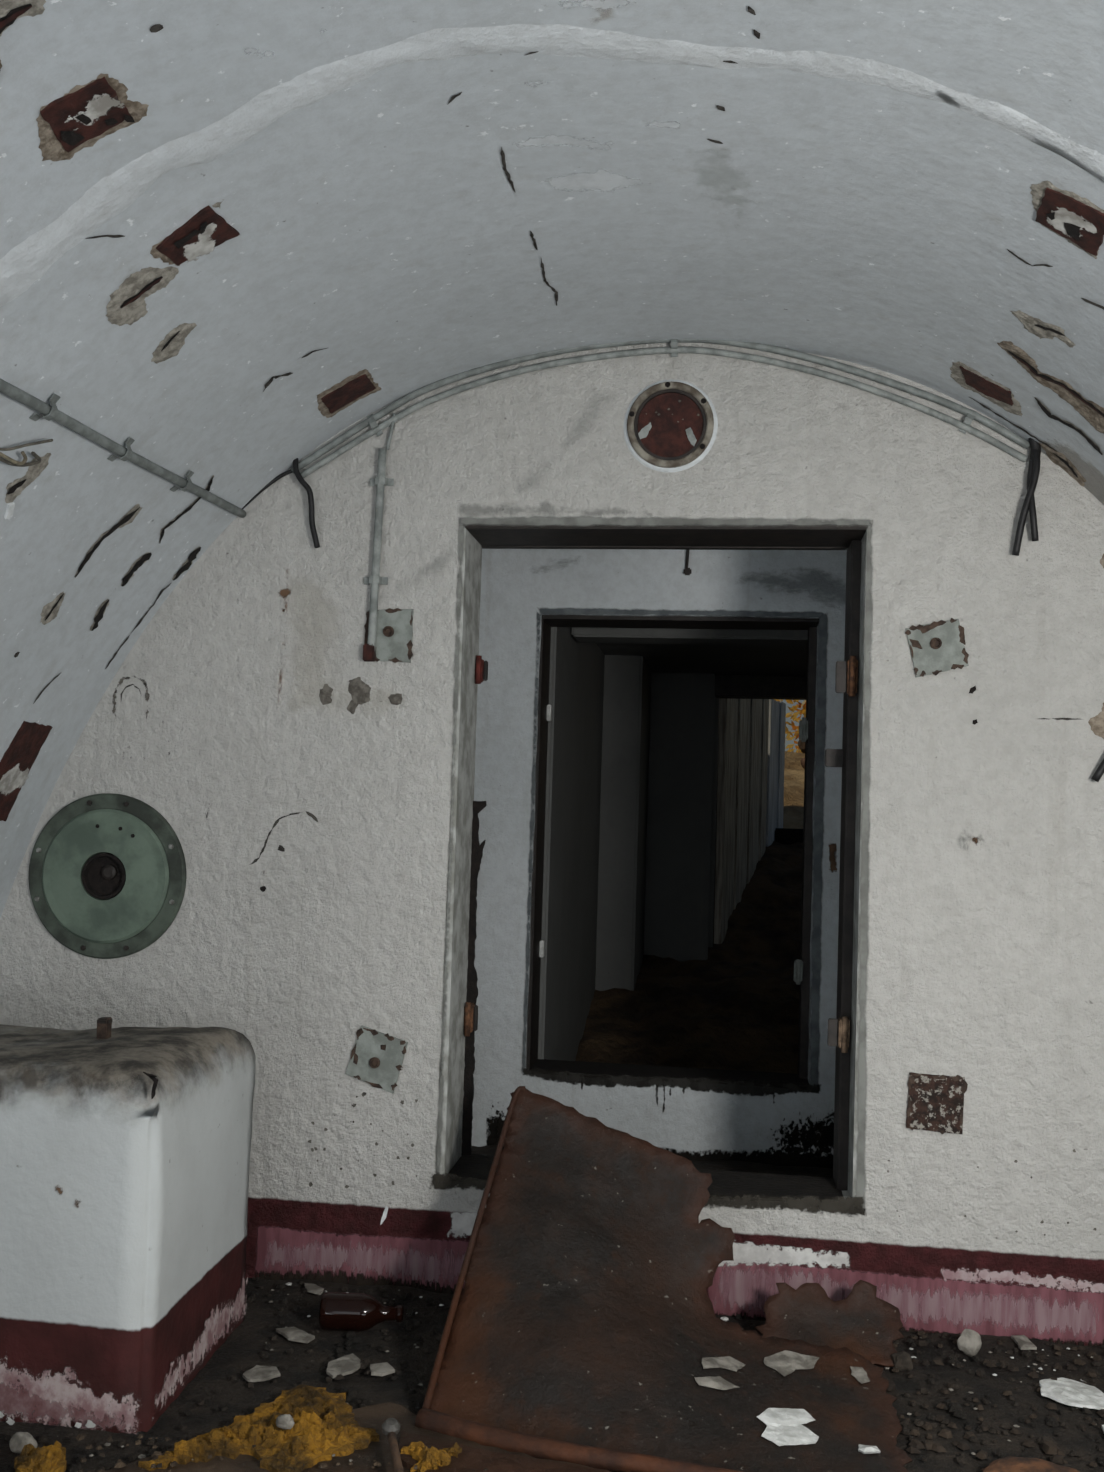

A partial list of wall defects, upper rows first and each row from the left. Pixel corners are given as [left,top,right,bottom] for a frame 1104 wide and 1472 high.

spalling [0,0,46,37]
spalling [36,73,149,161]
crack [500,147,515,192]
spalling [1030,180,1104,259]
spalling [106,202,222,326]
crack [530,231,558,306]
spalling [1011,310,1075,348]
spalling [950,341,1104,455]
crack [106,584,170,668]
rust [906,1074,968,1134]
peeling [0,1206,477,1434]
peeling [708,1242,1104,1350]